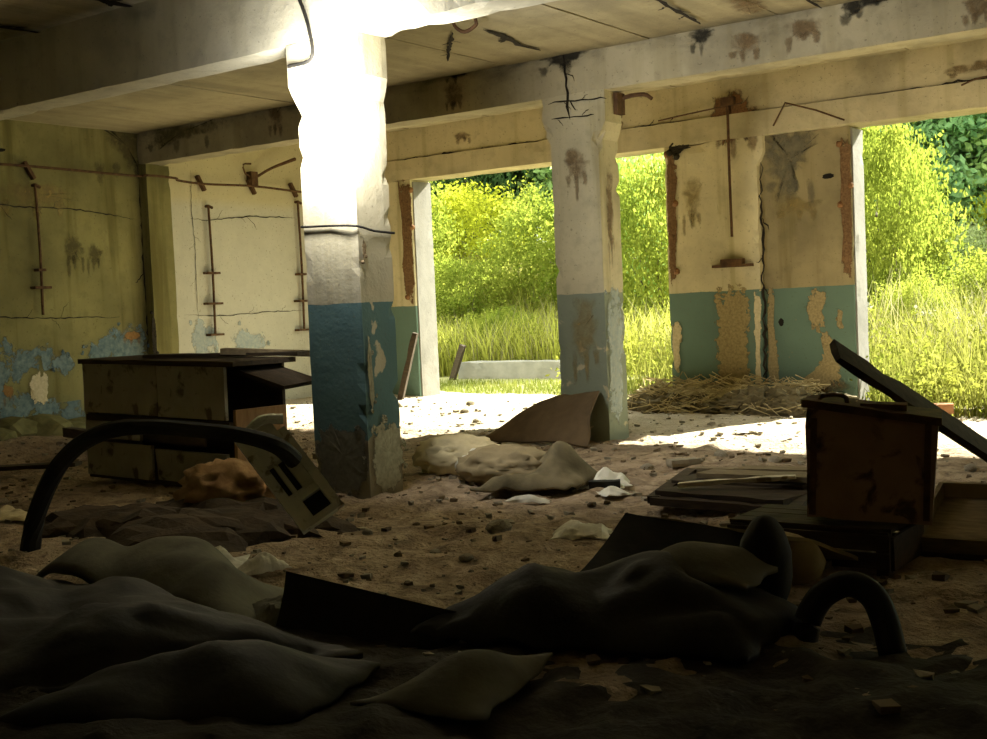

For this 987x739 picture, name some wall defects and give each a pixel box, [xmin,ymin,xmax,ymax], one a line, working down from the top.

damp [544,51,585,68]
crack [908,77,987,90]
damp [66,237,102,263]
peeling [0,311,159,420]
peeling [316,336,408,496]
peeling [714,284,784,388]
peeling [805,288,844,391]